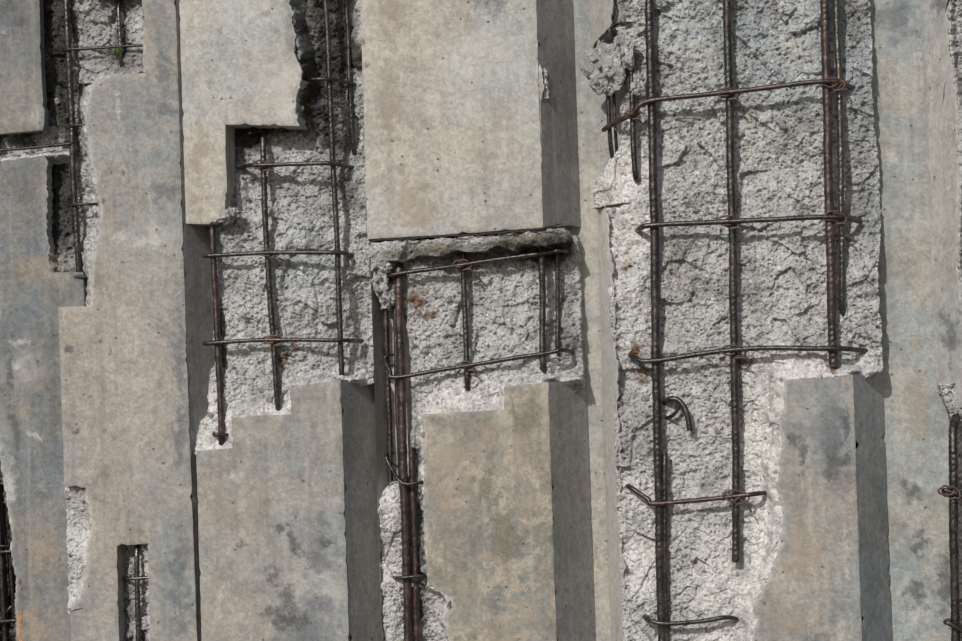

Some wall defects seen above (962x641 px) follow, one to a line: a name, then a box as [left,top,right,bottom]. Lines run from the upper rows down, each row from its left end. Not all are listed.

spalling [947,0,962,303]
spalling [195,0,586,641]
corrosion [408,291,435,319]
corrosion [629,344,648,383]
spalling [582,0,884,641]
spalling [0,461,17,641]
spalling [64,486,92,614]
spalling [124,543,151,641]
spalling [937,383,962,641]